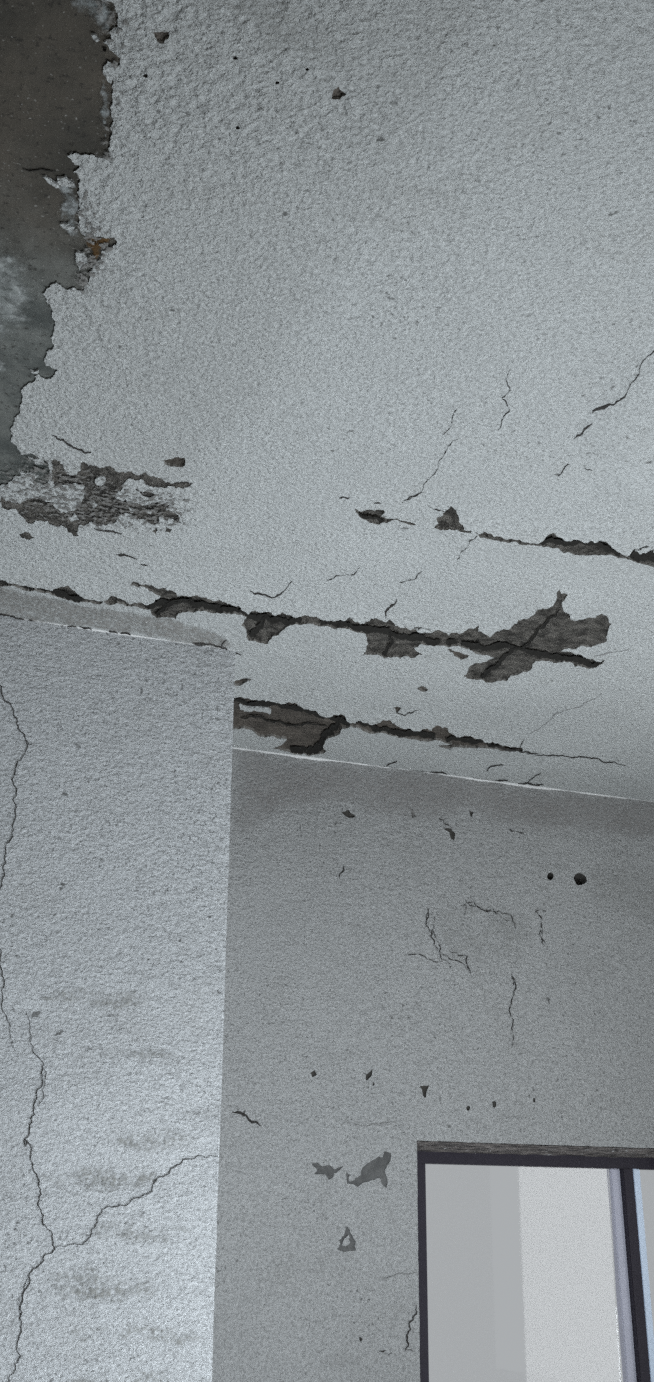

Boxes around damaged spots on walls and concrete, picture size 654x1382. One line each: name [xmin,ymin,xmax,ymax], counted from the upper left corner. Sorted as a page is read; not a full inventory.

flaking render [0,0,195,540]
crack [339,410,458,512]
crack [558,351,654,477]
flaking render [355,509,416,526]
flaking render [434,506,472,533]
crack [0,528,654,786]
crack [0,685,31,888]
crack [410,902,547,973]
crack [0,949,217,1382]
peeling [312,1151,391,1188]
peeling [337,1227,356,1252]
crack [380,1272,417,1354]